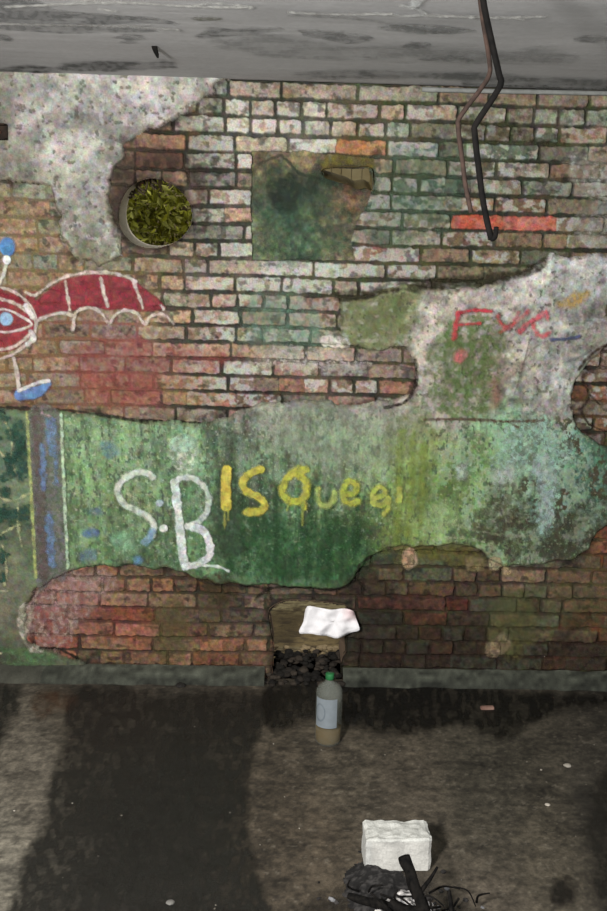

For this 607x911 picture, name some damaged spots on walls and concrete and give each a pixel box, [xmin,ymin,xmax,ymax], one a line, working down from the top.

leakage [59,62,137,71]
leakage [420,73,491,81]
flaking render [0,78,607,534]
peeling [0,536,10,583]
flaking render [21,524,607,679]